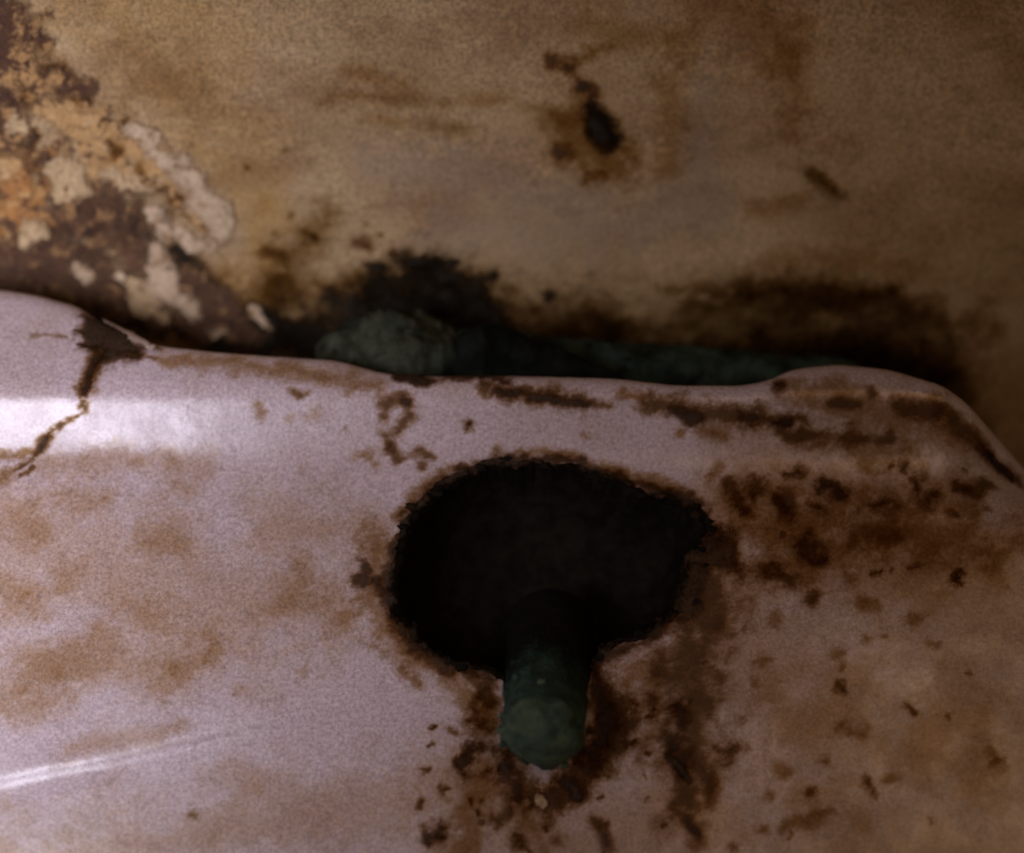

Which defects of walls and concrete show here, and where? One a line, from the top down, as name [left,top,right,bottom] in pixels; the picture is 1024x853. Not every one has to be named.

flaking render [0,84,324,365]
mould [201,249,514,359]
crack [18,329,103,476]
corrosion [378,373,608,463]
corrosion [641,393,821,443]
corrosion [723,467,804,515]
corrosion [812,477,849,510]
corrosion [351,454,741,846]
corrosion [590,817,611,853]